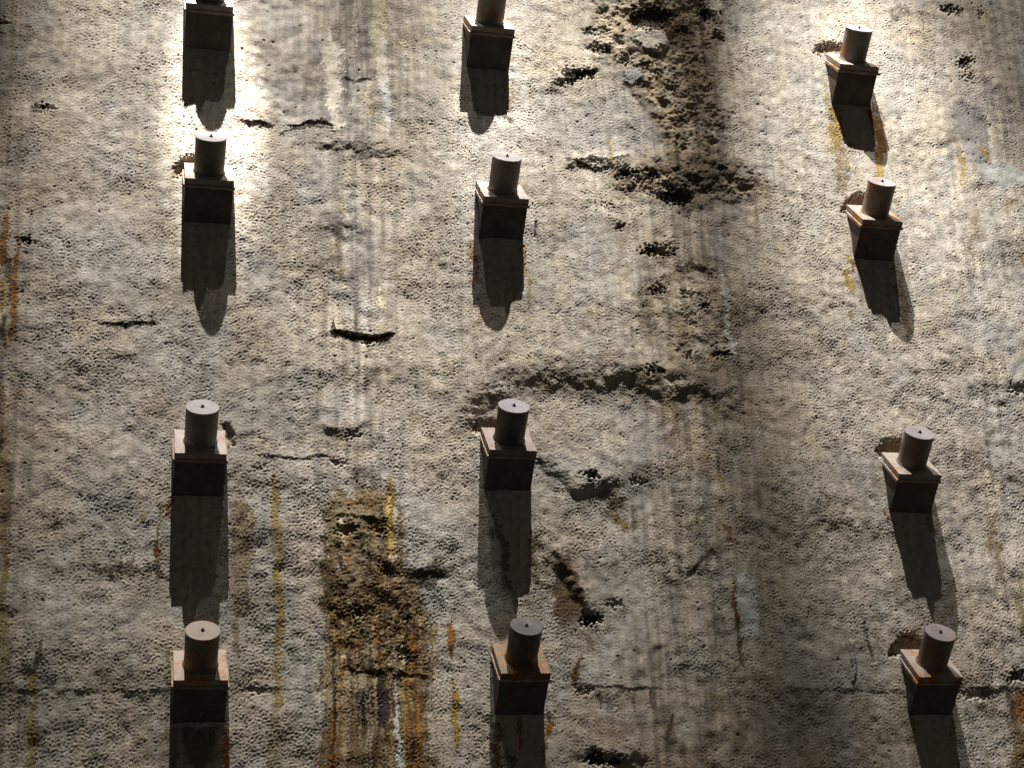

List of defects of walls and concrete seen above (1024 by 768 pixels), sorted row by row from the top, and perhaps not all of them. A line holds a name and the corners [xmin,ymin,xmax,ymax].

crack [242,117,346,135]
spalling [565,69,597,82]
spalling [582,0,764,215]
corrosion [823,79,853,196]
corrosion [865,101,887,177]
corrosion [0,209,22,351]
crack [99,320,158,331]
crack [331,320,396,346]